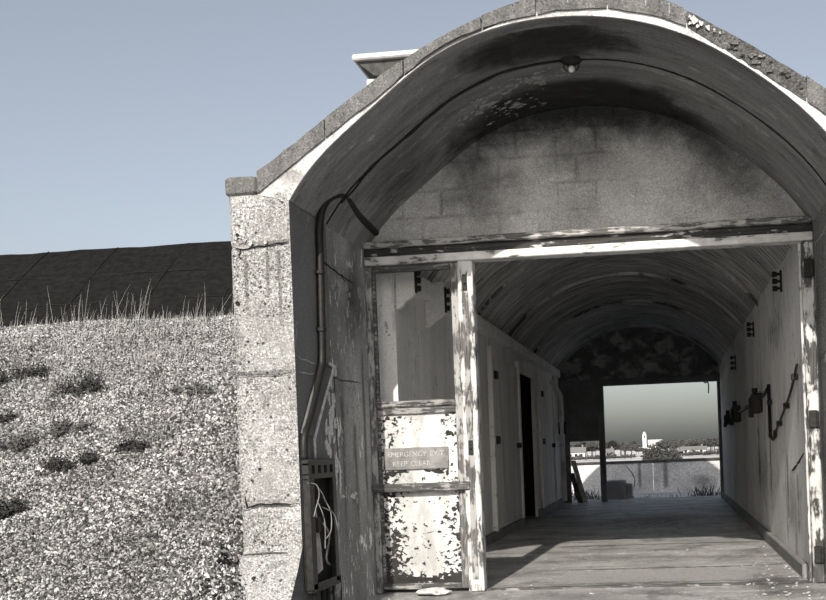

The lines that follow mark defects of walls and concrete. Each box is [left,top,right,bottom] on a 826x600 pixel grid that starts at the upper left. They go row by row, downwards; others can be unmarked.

peeling [443,66,570,131]
crack [234,240,287,260]
crack [324,261,352,292]
peeling [383,465,409,480]
crack [243,496,291,510]